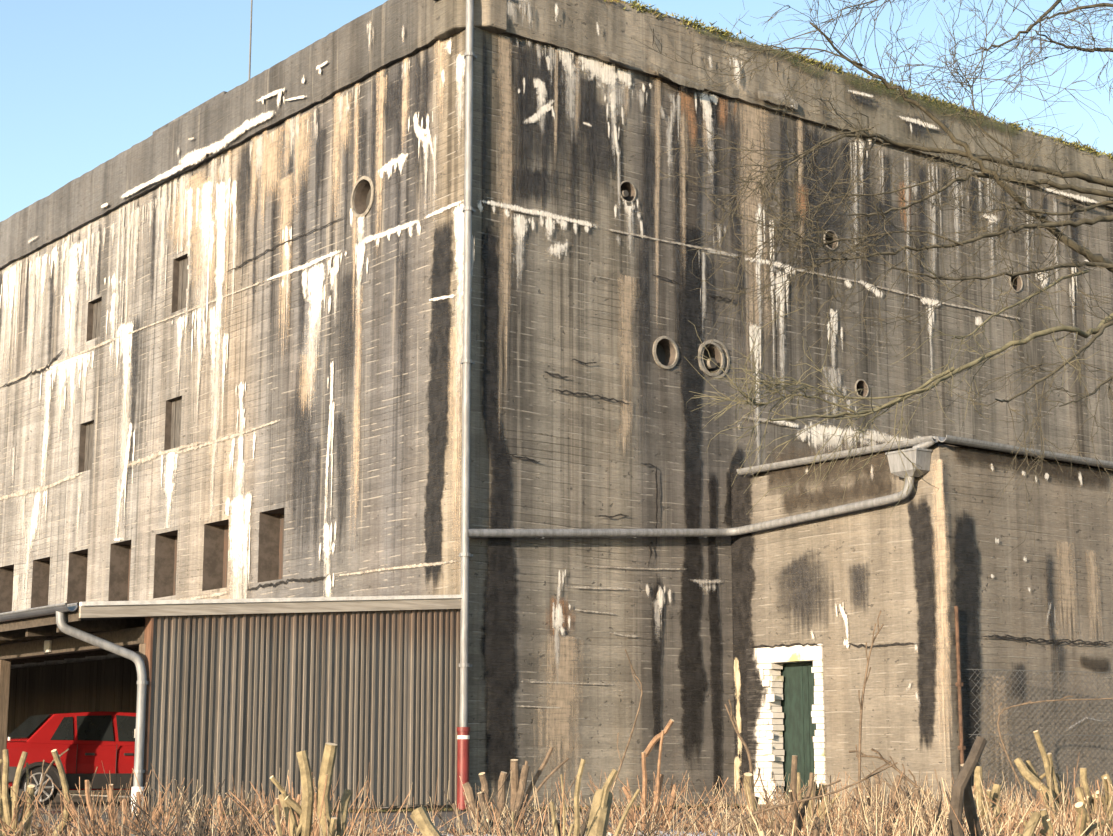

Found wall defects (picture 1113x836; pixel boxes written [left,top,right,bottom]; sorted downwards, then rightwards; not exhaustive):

damp [0,76,306,607]
damp [267,39,1007,796]
rust [797,118,806,251]
damp [1026,187,1100,320]